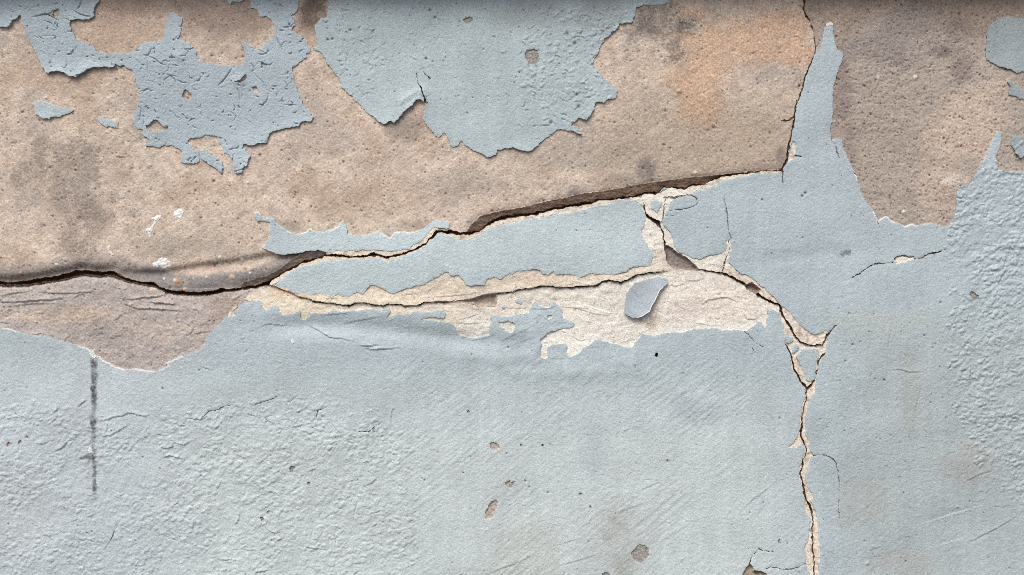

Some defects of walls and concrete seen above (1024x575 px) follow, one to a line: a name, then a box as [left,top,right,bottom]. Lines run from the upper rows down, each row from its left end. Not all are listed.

crack [202,396,295,417]
flaking render [0,185,829,575]
crack [0,0,836,346]
peeling [0,0,1024,293]
crack [785,344,840,575]
crack [852,249,945,278]